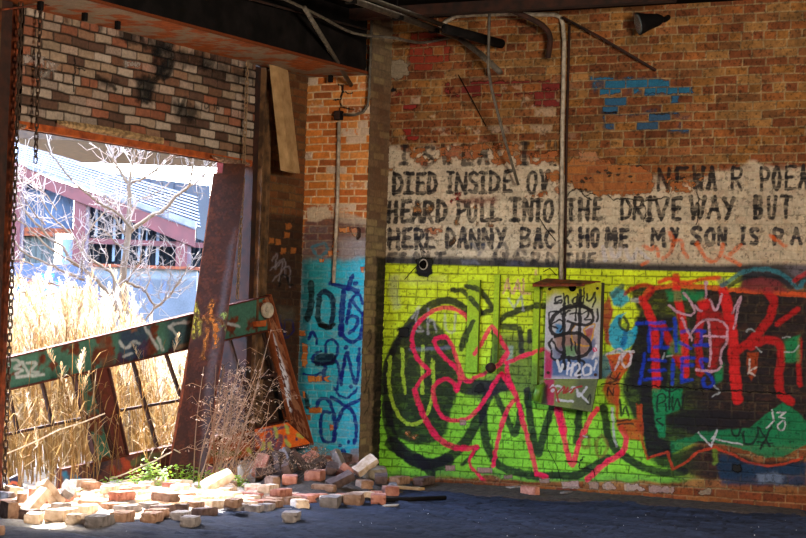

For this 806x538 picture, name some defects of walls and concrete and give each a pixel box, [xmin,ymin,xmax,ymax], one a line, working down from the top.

peeling [403,129,656,198]